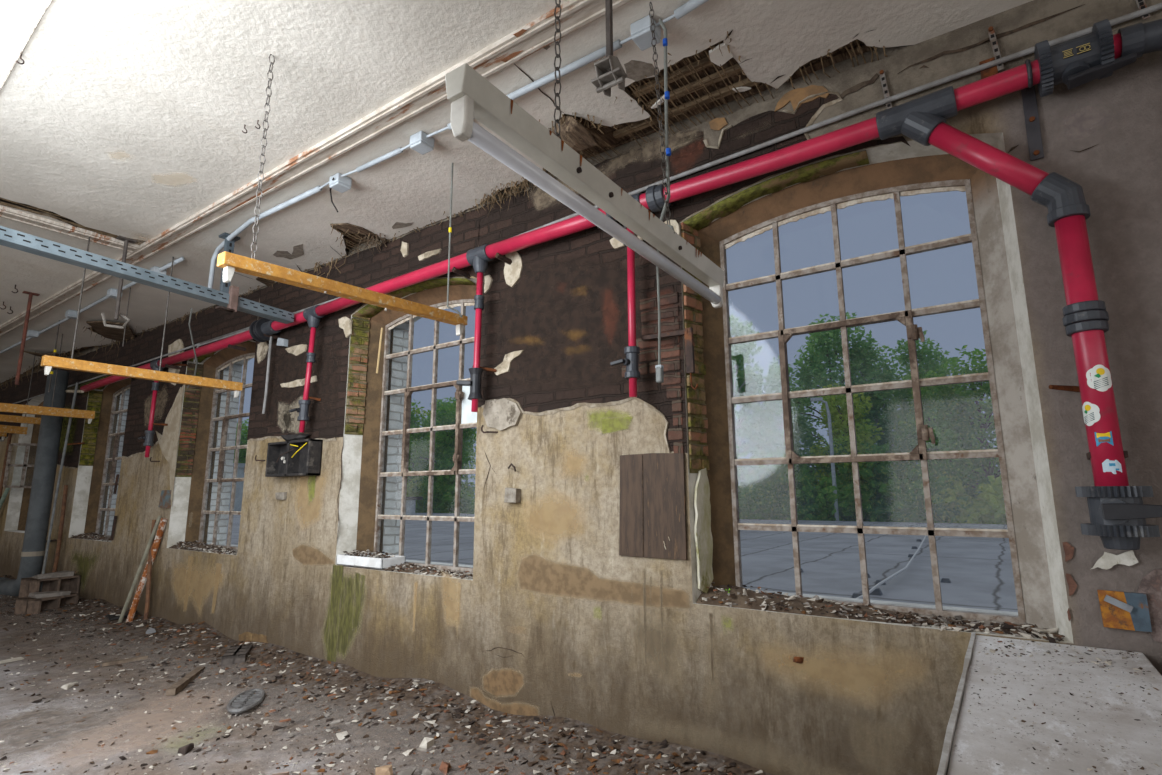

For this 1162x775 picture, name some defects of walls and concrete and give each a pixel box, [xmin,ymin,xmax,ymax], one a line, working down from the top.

flaking render [539,31,888,193]
flaking render [543,168,599,209]
flaking render [648,136,911,250]
flaking render [0,177,714,593]
damp [601,416,633,434]
damp [327,565,365,662]
peeling [1091,550,1138,570]
spalling [1138,569,1162,642]